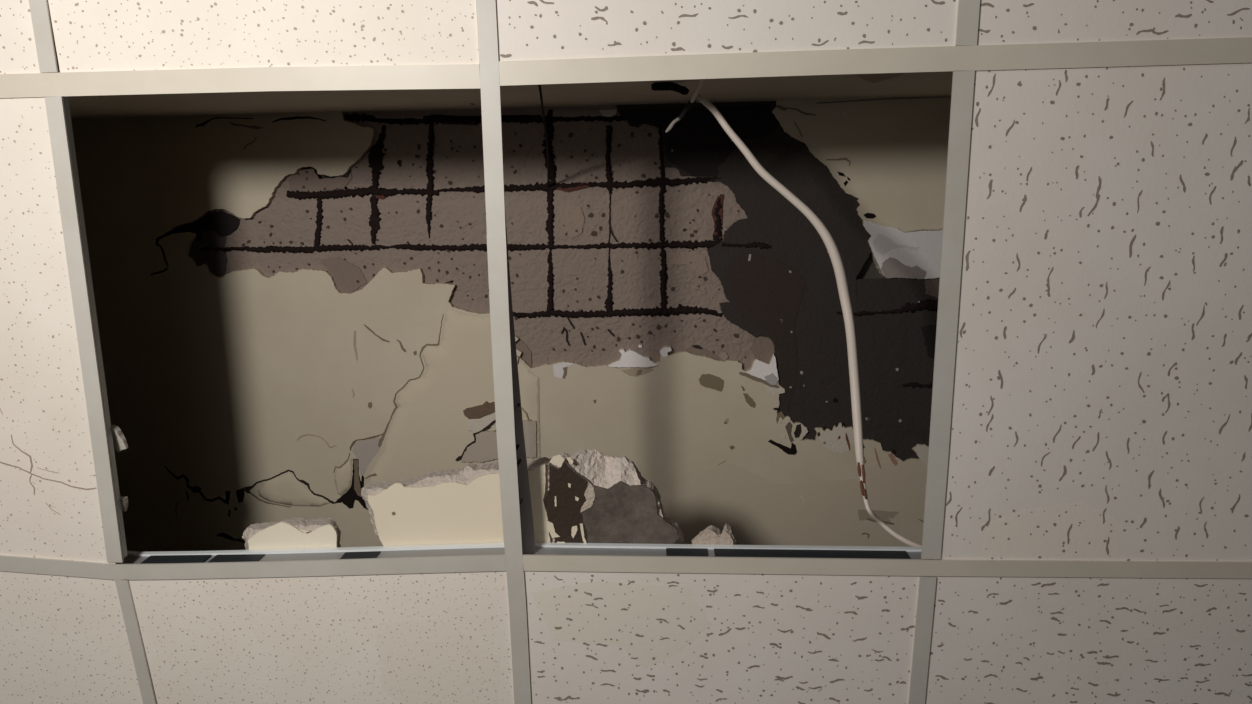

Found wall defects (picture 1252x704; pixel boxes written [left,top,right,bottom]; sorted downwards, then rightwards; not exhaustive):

corrosion [199,112,487,253]
spalling [208,109,490,313]
corrosion [501,110,771,318]
spalling [501,105,785,408]
leakage [617,104,780,177]
crack [0,409,96,515]
crack [164,314,444,508]
spalling [333,459,368,510]
crack [455,408,531,461]
leakage [712,244,858,455]
leakage [668,449,927,546]
leakage [903,324,937,432]